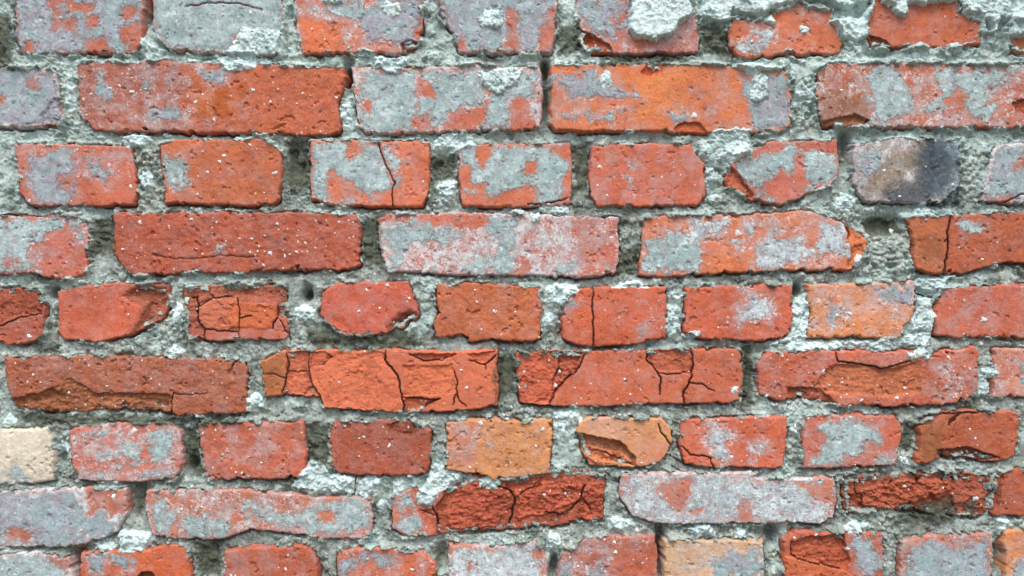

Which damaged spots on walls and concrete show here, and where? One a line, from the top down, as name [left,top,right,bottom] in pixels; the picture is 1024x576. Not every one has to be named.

crack [942,216,951,273]
crack [194,296,248,367]
crack [271,305,331,400]
crack [384,354,495,411]
crack [549,290,594,406]
crack [645,349,706,401]
crack [836,345,927,369]
crack [498,484,540,522]
crack [547,485,591,516]
spalling [391,417,1004,536]